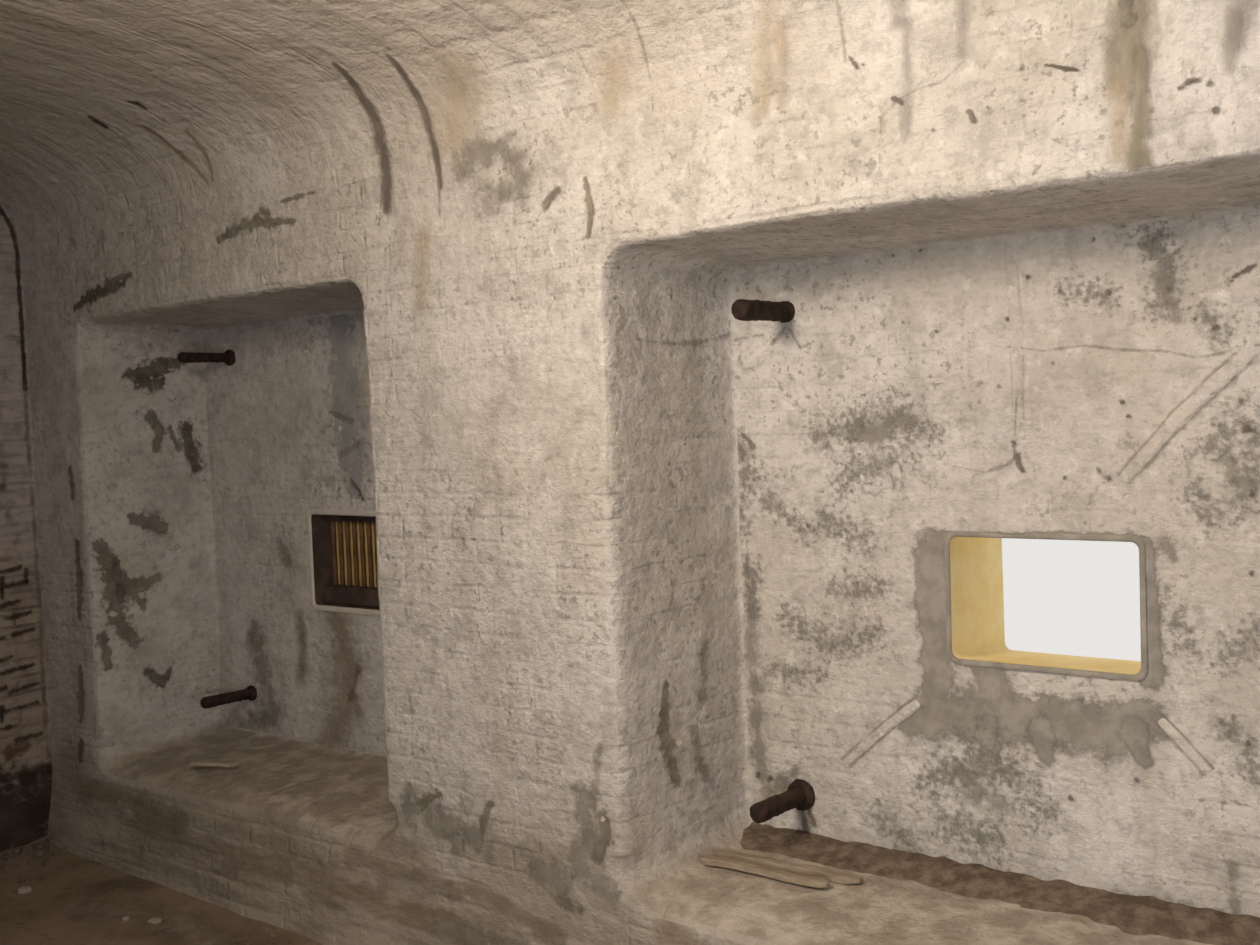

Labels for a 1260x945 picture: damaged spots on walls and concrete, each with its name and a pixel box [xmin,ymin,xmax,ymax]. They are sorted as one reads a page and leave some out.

damp [1106,0,1150,170]
peeling [216,191,314,244]
peeling [74,272,132,313]
peeling [122,353,185,392]
peeling [145,410,202,474]
peeling [74,539,160,671]
peeling [143,667,172,688]
damp [0,764,52,852]
damp [83,782,564,945]
damp [528,744,621,914]
rust [800,808,815,832]
damp [910,726,1073,865]